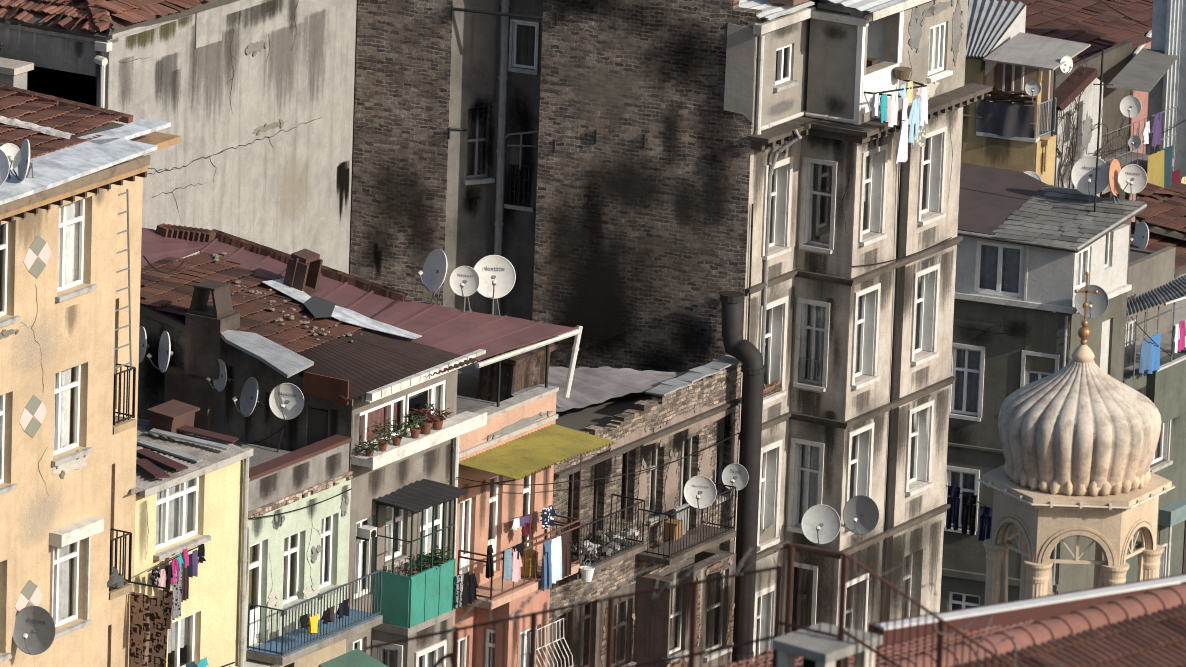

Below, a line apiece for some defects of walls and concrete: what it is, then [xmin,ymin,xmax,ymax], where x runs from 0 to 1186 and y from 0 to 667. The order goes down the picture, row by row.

water stain [160,15,192,39]
water stain [227,0,295,27]
crack [147,118,320,220]
water stain [337,165,350,220]
water stain [756,150,785,191]
water stain [541,164,662,362]
water stain [850,253,950,312]
water stain [640,323,713,372]
water stain [789,288,801,352]
water stain [768,403,781,420]
water stain [799,390,881,458]
water stain [794,533,809,545]